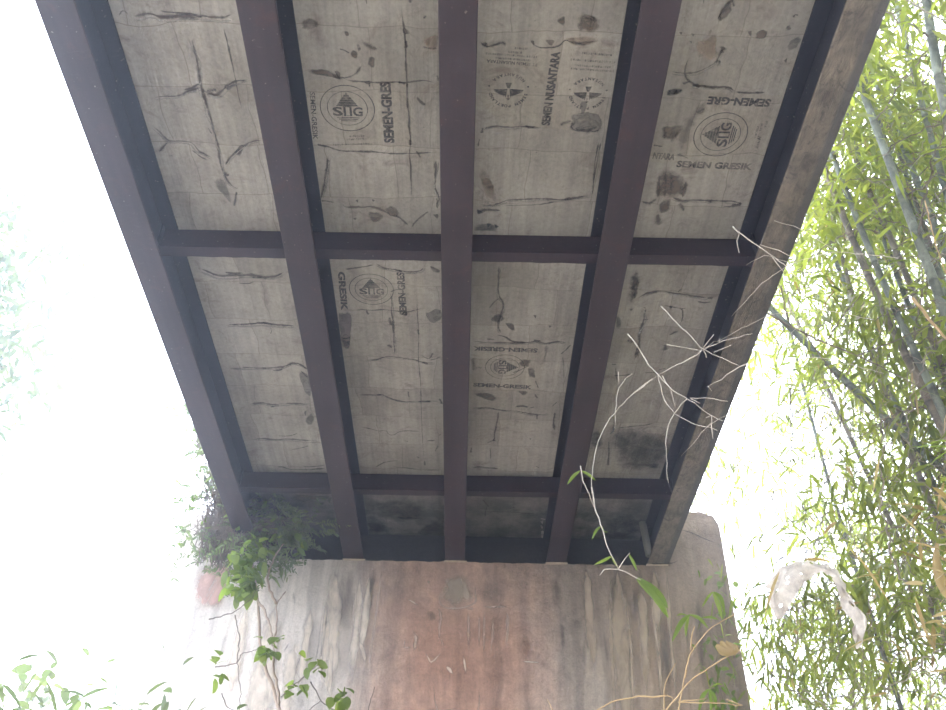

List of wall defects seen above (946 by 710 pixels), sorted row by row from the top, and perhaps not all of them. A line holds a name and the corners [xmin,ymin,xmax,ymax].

water stain [617,432,668,468]
water stain [227,611,246,690]
water stain [246,578,381,710]
water stain [585,572,596,663]
water stain [609,572,676,710]